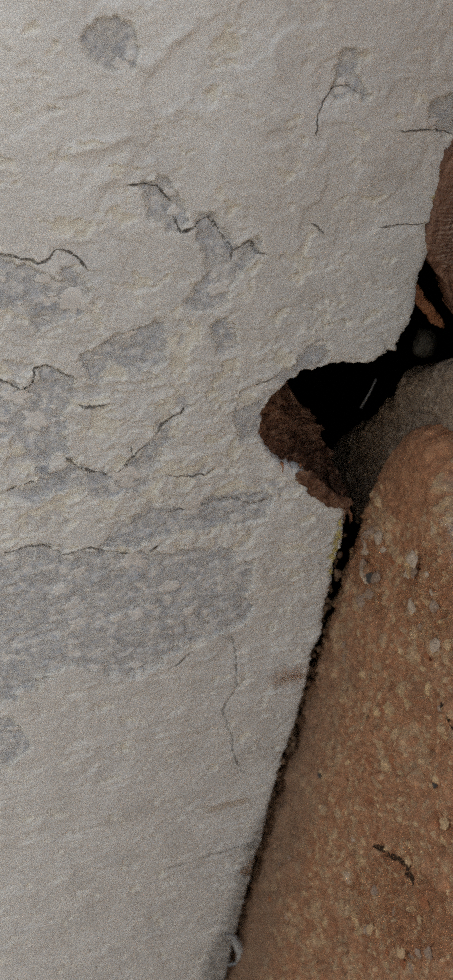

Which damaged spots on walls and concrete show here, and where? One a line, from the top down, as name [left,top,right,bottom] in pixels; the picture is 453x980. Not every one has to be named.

peeling [142,180,187,229]
crack [130,183,264,260]
crack [0,249,86,268]
peeling [186,214,261,308]
crack [0,365,73,393]
peeling [282,340,327,380]
peeling [235,403,263,440]
spalling [356,526,387,607]
spalling [398,549,429,579]
spalling [430,638,452,653]
crack [184,605,249,775]
spalling [363,922,433,974]